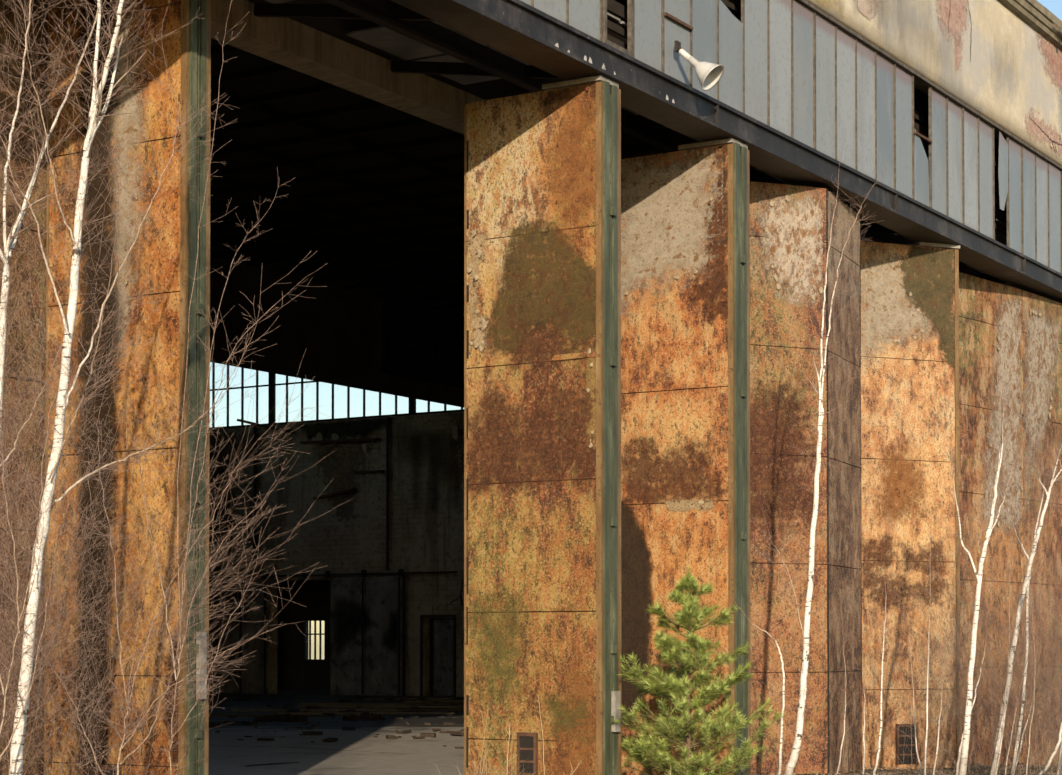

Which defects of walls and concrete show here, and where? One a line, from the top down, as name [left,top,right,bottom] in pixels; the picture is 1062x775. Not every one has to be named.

spalling [936,0,968,69]
spalling [1038,35,1062,89]
spalling [1025,108,1062,155]
rust [689,145,728,322]
damp [489,221,596,354]
damp [901,246,955,369]
rust [621,438,723,504]
rust [750,384,819,548]
rust [878,446,925,519]
rust [862,537,948,607]